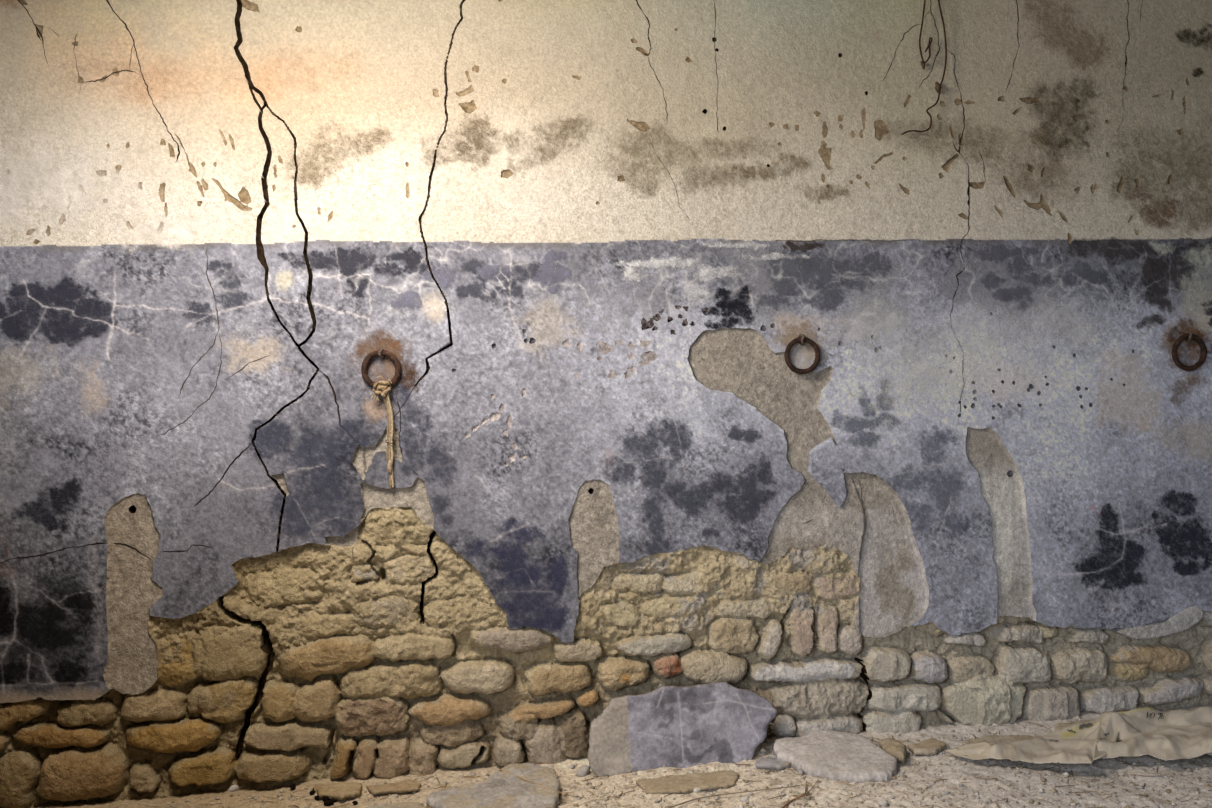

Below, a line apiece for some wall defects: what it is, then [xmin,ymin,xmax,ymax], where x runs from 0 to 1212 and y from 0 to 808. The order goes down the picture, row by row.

crack [18,0,191,169]
water stain [0,277,118,346]
crack [160,0,359,552]
rust [357,333,418,389]
crack [393,0,465,477]
rust [775,323,820,369]
crack [420,531,438,624]
flaking render [0,305,1212,808]
water stain [605,419,776,555]
water stain [1073,504,1144,590]
water stain [1152,490,1212,576]
crack [216,596,275,758]